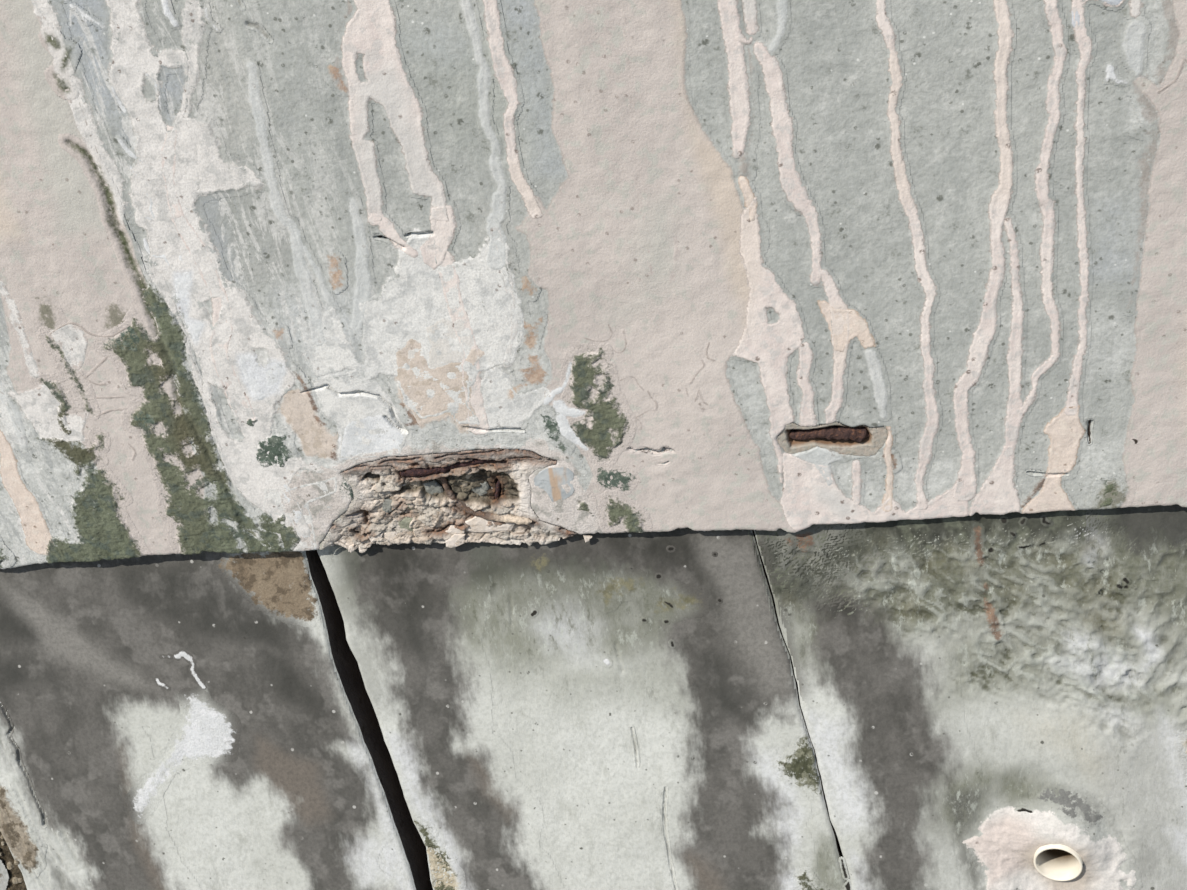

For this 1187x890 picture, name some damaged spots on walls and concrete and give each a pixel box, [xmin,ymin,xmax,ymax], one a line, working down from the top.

corrosion [789,425,902,473]
spalling [319,449,592,553]
corrosion [399,458,532,525]
water stain [802,574,875,611]
water stain [847,579,885,606]
crack [0,699,47,828]
efflorescence [124,649,242,825]
peeling [1028,783,1115,835]